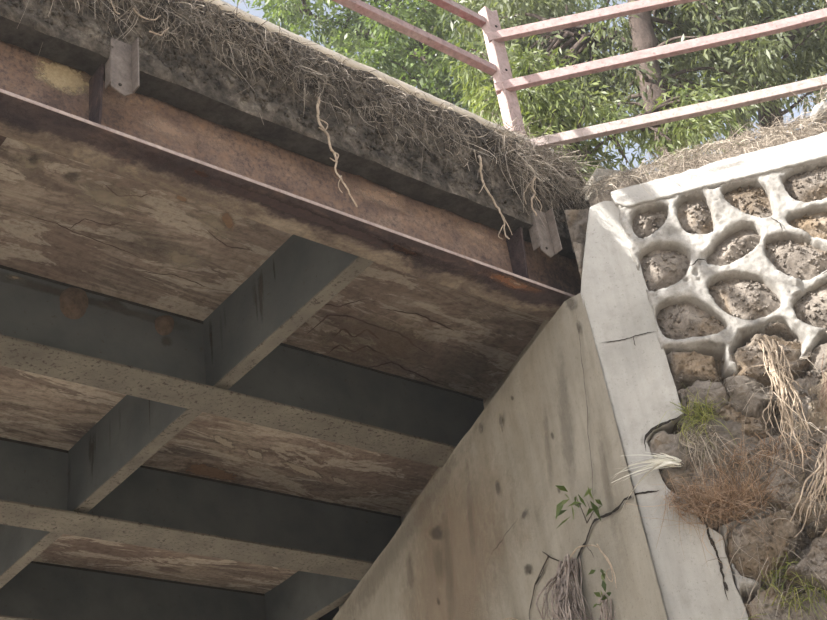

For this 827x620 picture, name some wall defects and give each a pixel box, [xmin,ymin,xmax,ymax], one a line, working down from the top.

crack [577,337,659,559]
crack [703,517,728,599]